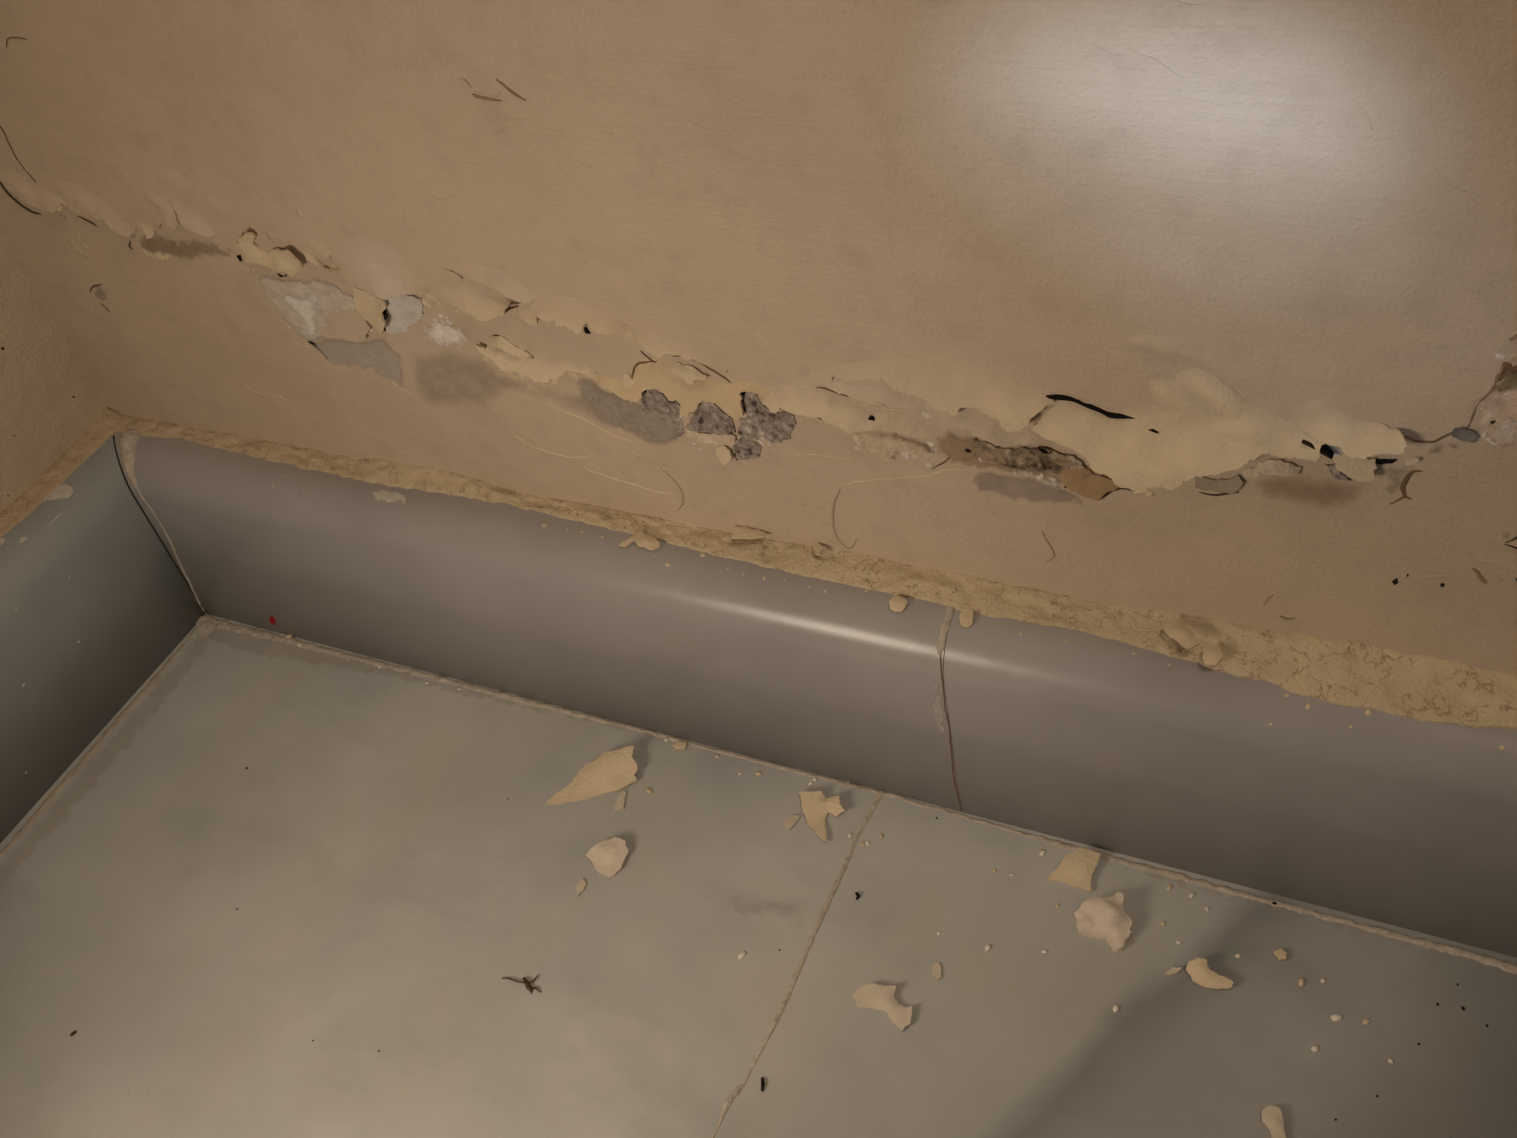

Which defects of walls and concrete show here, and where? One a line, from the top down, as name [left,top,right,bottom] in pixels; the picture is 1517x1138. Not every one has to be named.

peeling [0,167,1517,501]
crack [940,654,963,811]